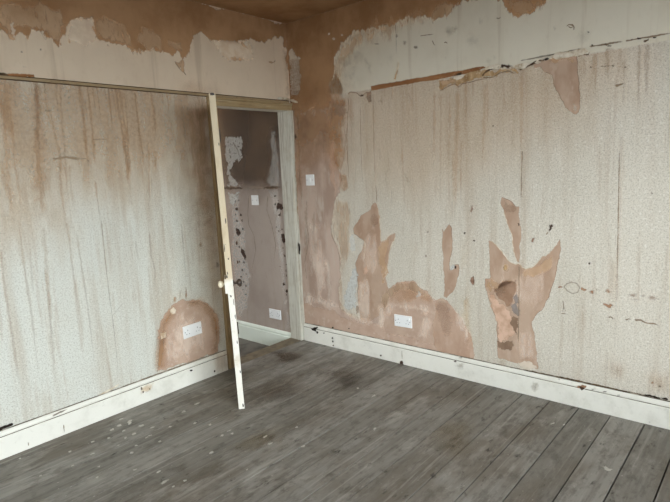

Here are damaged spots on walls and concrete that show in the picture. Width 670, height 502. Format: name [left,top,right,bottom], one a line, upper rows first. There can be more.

flaking render [497,0,546,18]
spalling [439,48,589,90]
leakage [294,100,345,167]
flaking render [0,0,474,362]
peeling [487,280,519,350]